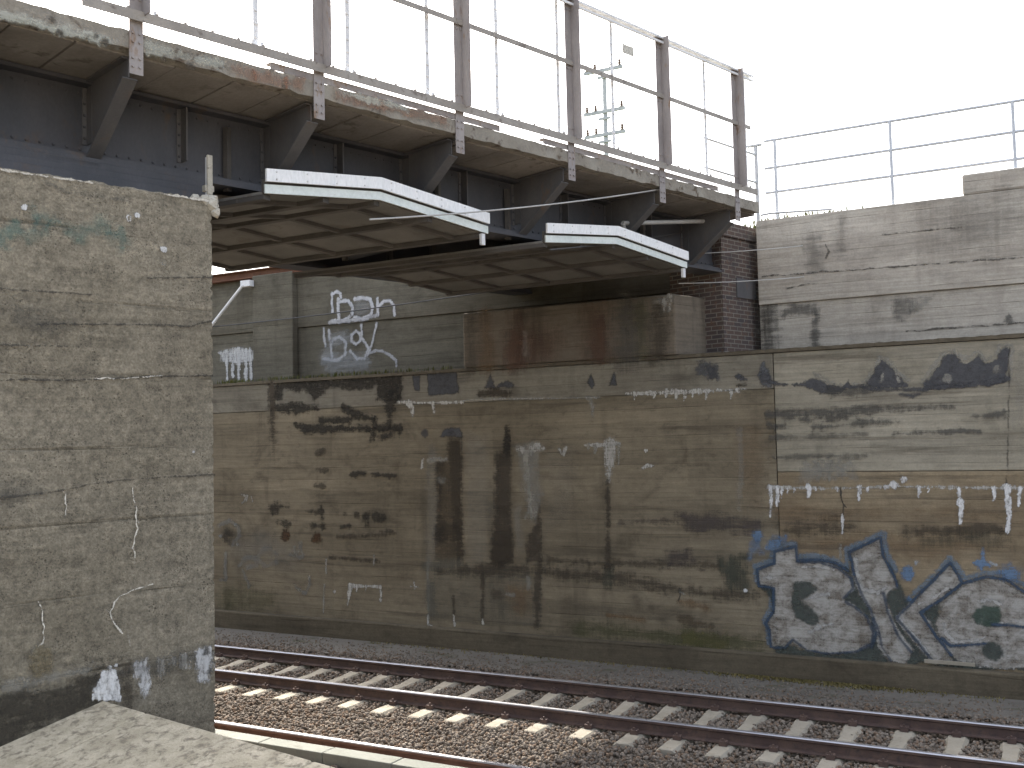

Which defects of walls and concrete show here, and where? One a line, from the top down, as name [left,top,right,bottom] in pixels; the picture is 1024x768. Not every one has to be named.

damp [267,371,464,441]
damp [625,388,746,400]
crack [0,474,215,558]
damp [420,427,760,628]
damp [674,477,1024,538]
crack [106,583,153,643]
damp [0,646,212,746]